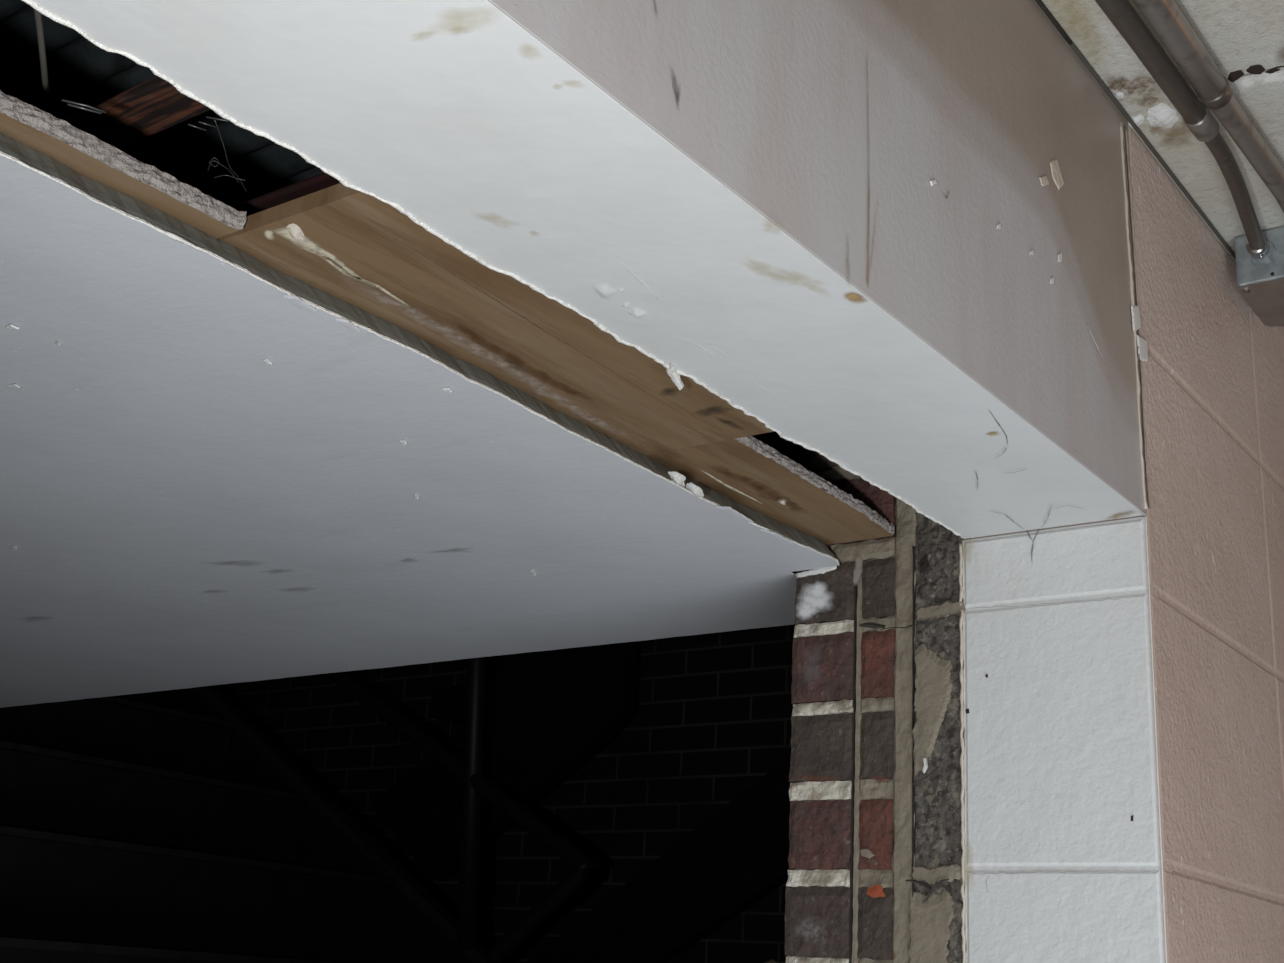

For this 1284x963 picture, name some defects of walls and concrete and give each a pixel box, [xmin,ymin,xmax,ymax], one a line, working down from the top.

crack [1228,65,1284,83]
spalling [0,90,247,229]
peeling [283,295,318,313]
peeling [336,318,361,332]
flaking render [666,364,684,390]
spalling [734,436,895,535]
peeling [715,506,794,545]
leakage [798,583,825,618]